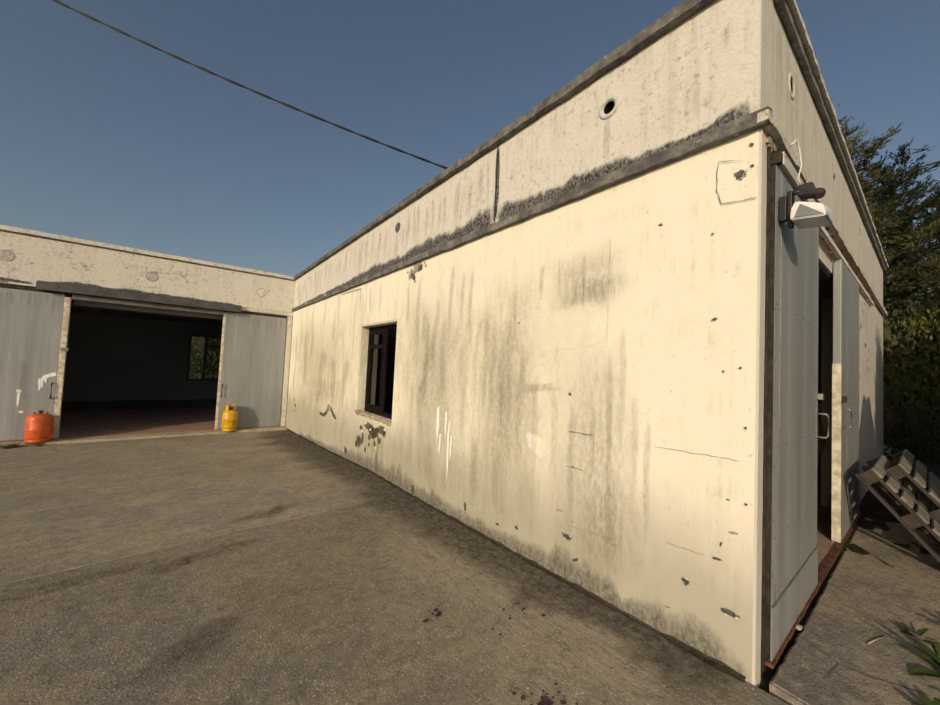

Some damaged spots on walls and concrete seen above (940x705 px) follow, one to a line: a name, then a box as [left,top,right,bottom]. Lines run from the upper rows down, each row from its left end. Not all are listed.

damp [303,105,749,304]
efflorescence [436,406,452,480]
damp [270,431,723,679]